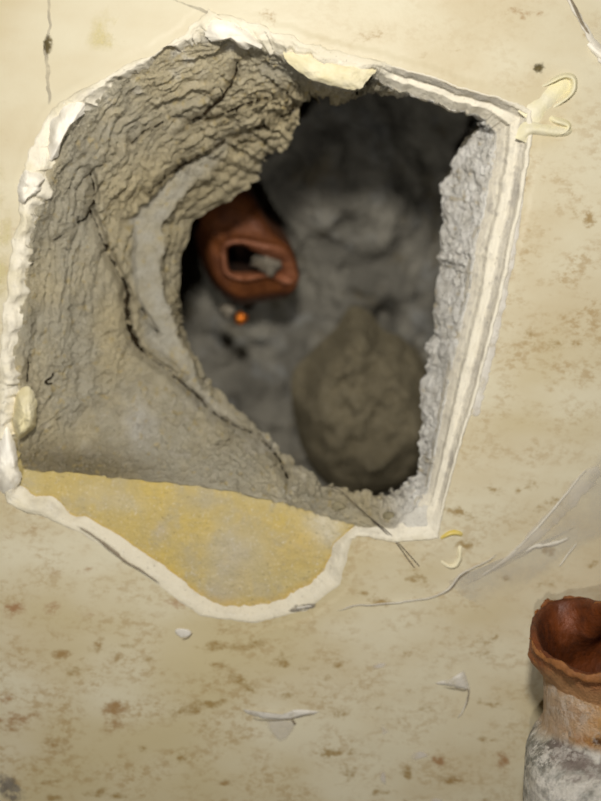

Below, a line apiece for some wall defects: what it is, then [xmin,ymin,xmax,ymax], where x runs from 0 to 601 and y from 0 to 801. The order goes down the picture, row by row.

flaking render [0,8,533,623]
corrosion [529,638,601,683]
peeling [245,709,317,738]